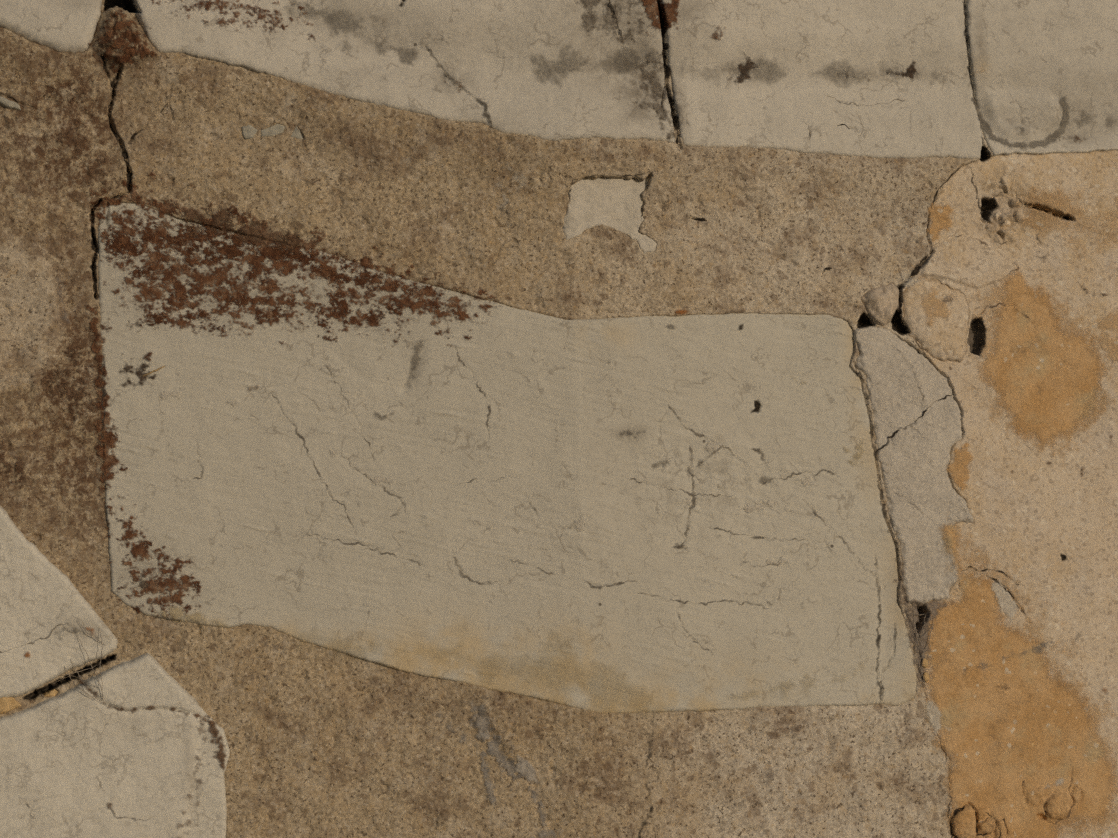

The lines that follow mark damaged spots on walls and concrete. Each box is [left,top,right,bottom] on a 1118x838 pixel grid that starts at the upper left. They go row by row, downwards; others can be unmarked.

corrosion [641,0,680,35]
crack [657,1,680,146]
crack [91,56,140,298]
corrosion [49,77,496,346]
flaking render [563,177,657,254]
peeling [1017,188,1118,244]
peeling [978,271,1109,455]
corrosion [34,305,202,621]
peeling [947,443,973,490]
peeling [925,525,1117,838]